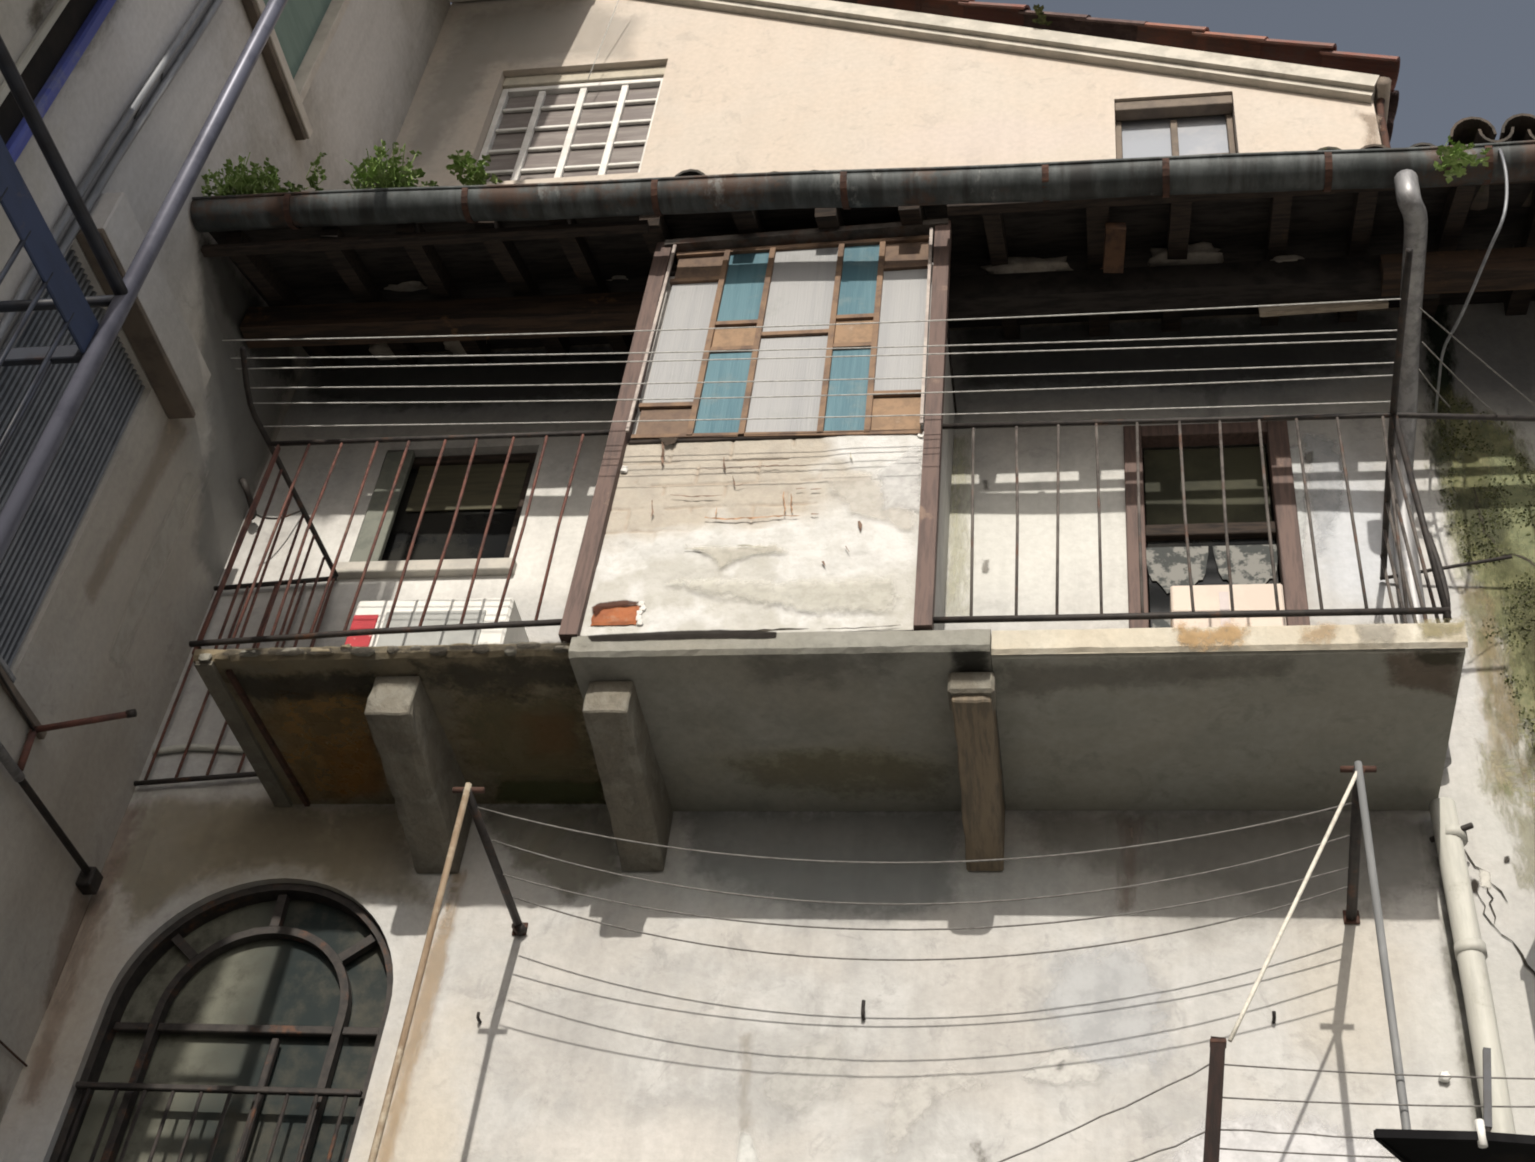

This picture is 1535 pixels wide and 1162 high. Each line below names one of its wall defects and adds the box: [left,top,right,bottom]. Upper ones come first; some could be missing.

spalling [660,437,678,445]
spalling [591,600,647,626]
corrosion [1178,622,1244,649]
damp [1388,651,1458,695]
corrosion [227,672,384,803]
damp [486,804,620,895]
crack [1464,849,1535,975]